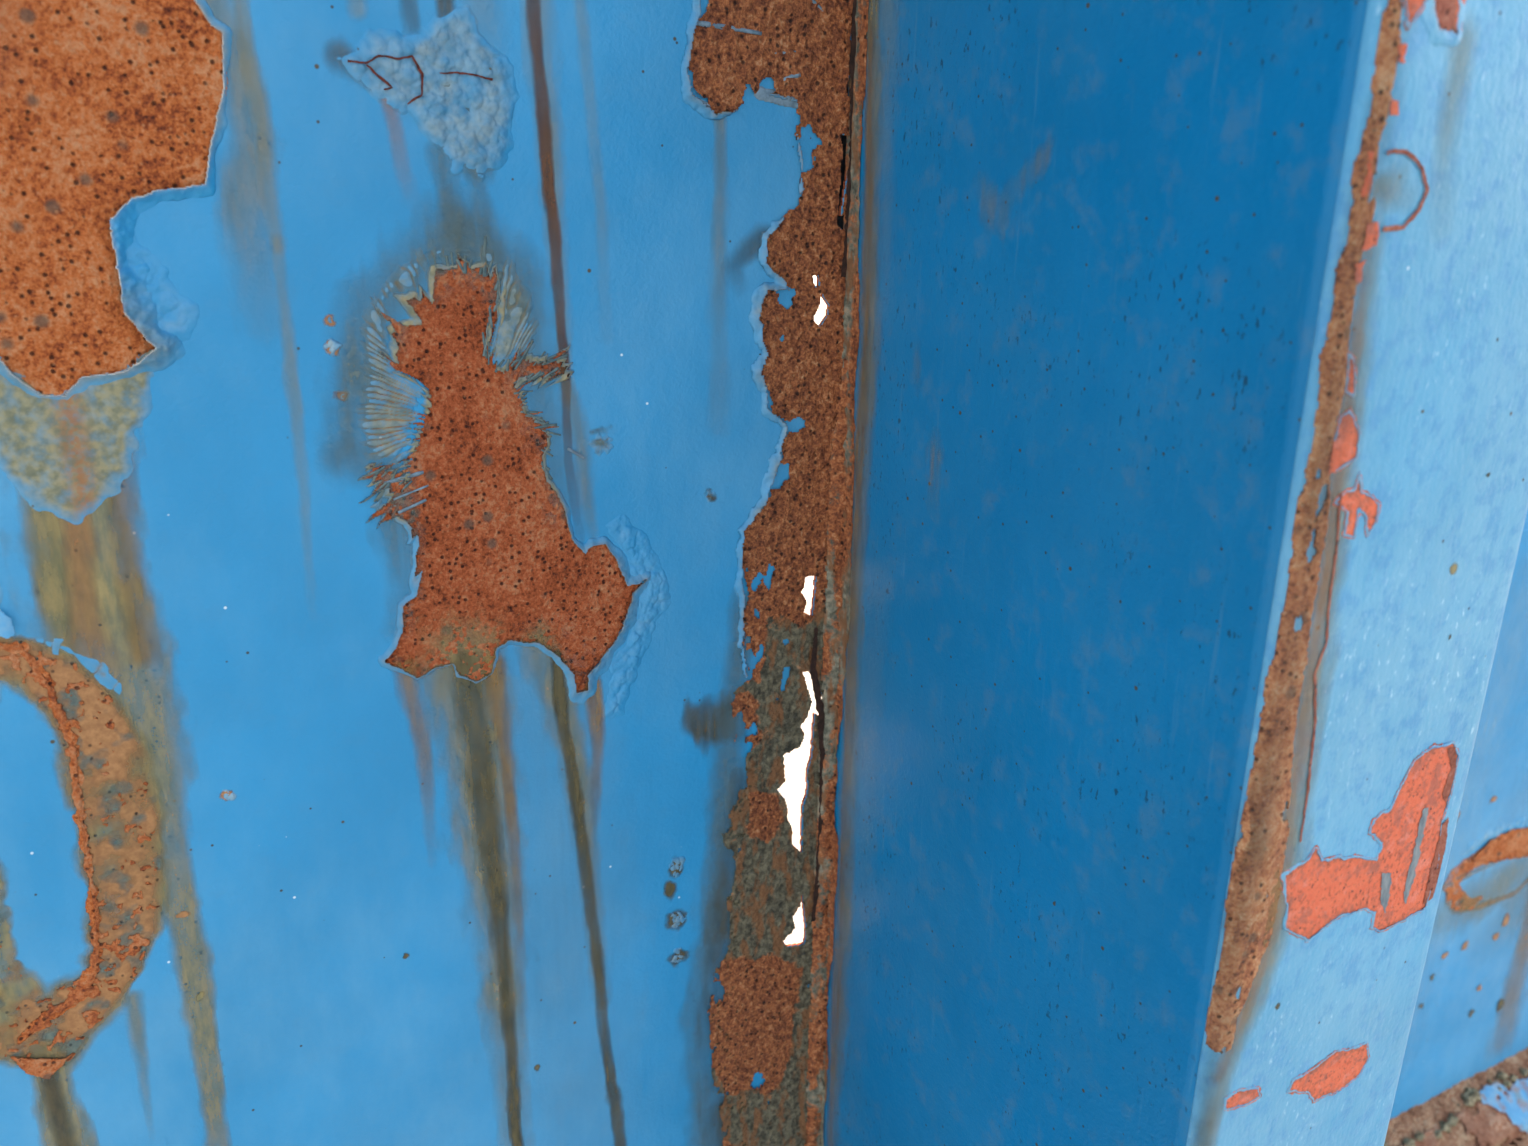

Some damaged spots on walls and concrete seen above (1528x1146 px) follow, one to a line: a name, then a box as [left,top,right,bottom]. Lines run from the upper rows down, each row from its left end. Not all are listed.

peeling [1403,0,1428,31]
rust [1420,0,1466,48]
leakage [588,430,614,457]
rust [0,0,246,1146]
rust [680,0,878,1146]
rust [1205,0,1408,1053]
peeling [1280,741,1460,943]
rust [1442,815,1528,968]
peeling [1286,1042,1370,1103]
peeling [1455,1090,1525,1146]